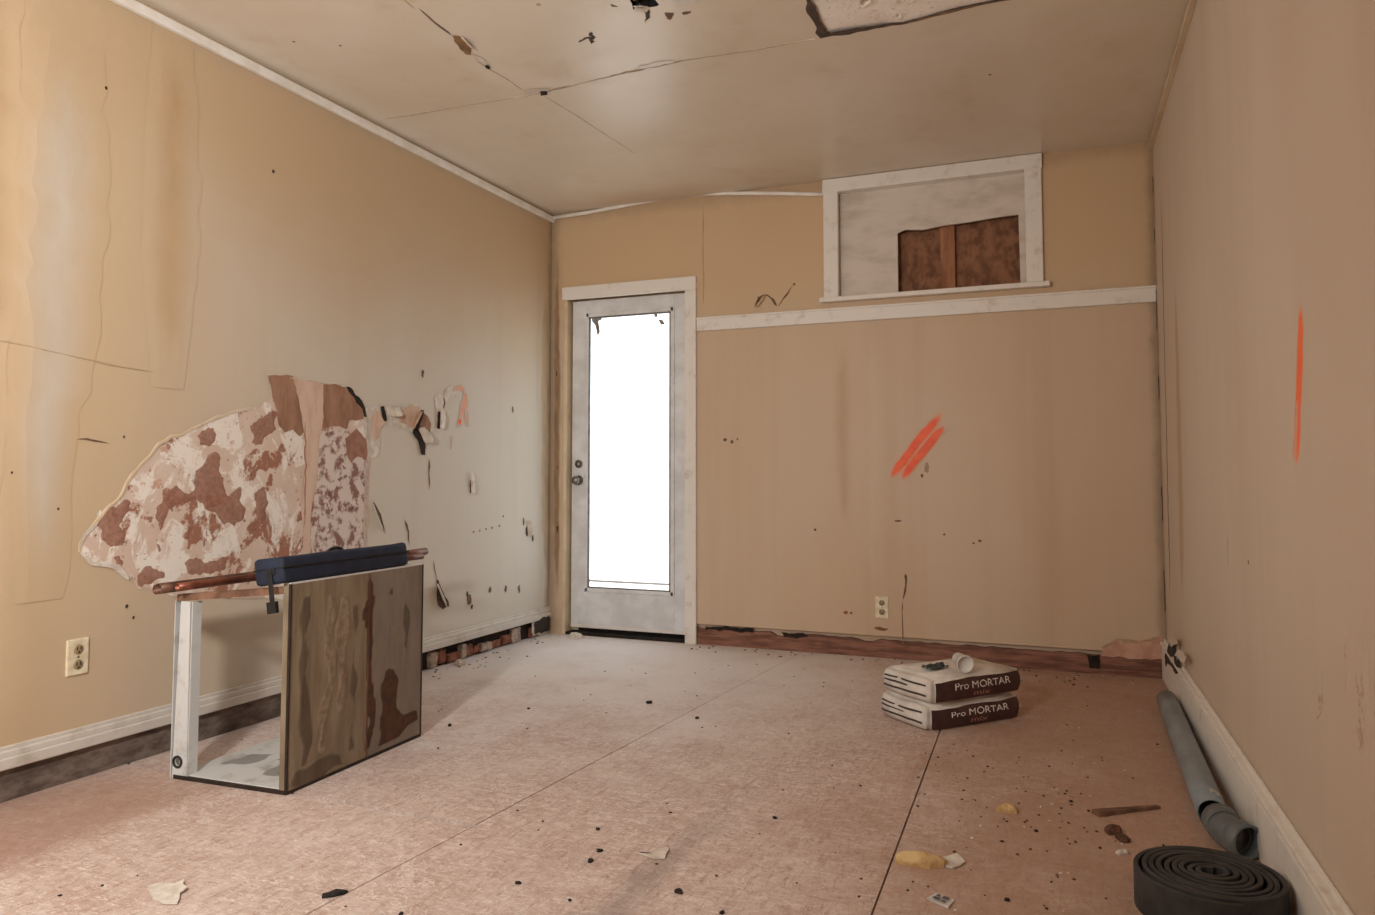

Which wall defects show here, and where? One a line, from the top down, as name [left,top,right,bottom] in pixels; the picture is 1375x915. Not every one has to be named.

peeling [610,3,692,23]
peeling [806,0,1007,39]
peeling [78,372,431,600]
flaking render [422,623,538,671]